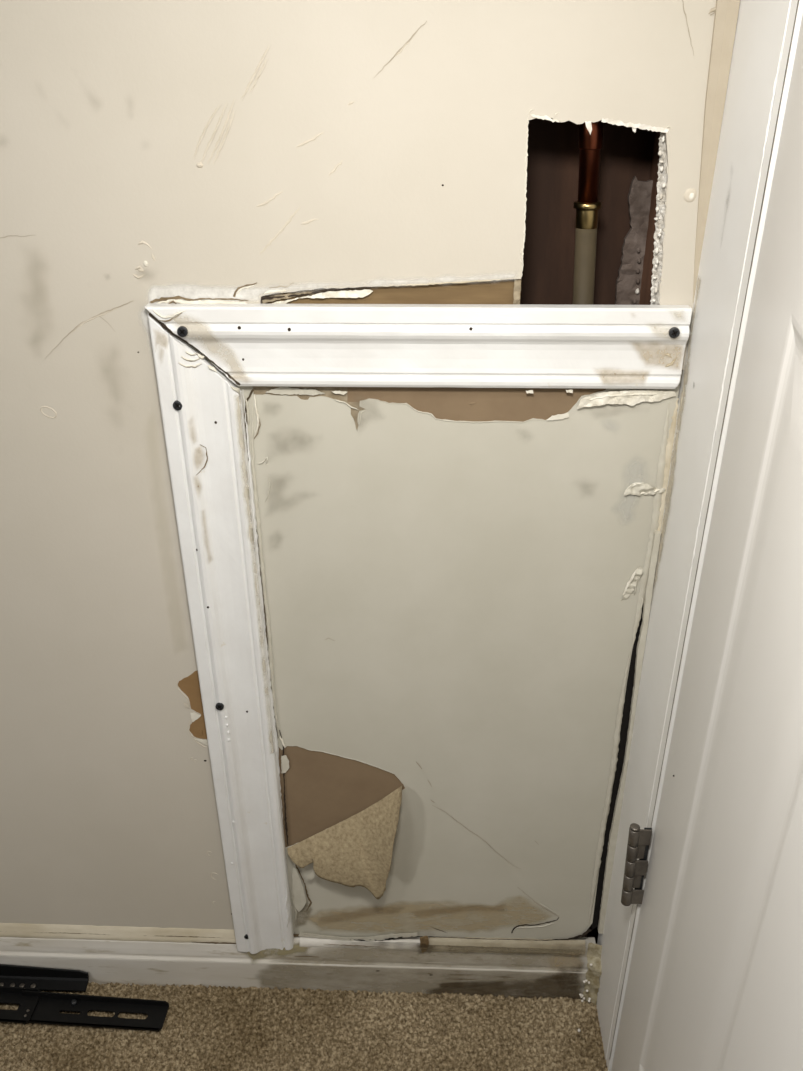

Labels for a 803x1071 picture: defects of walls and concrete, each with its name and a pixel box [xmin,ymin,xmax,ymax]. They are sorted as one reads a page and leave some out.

peeling [176,670,208,748]
crack [293,598,644,941]
water stain [310,904,542,931]